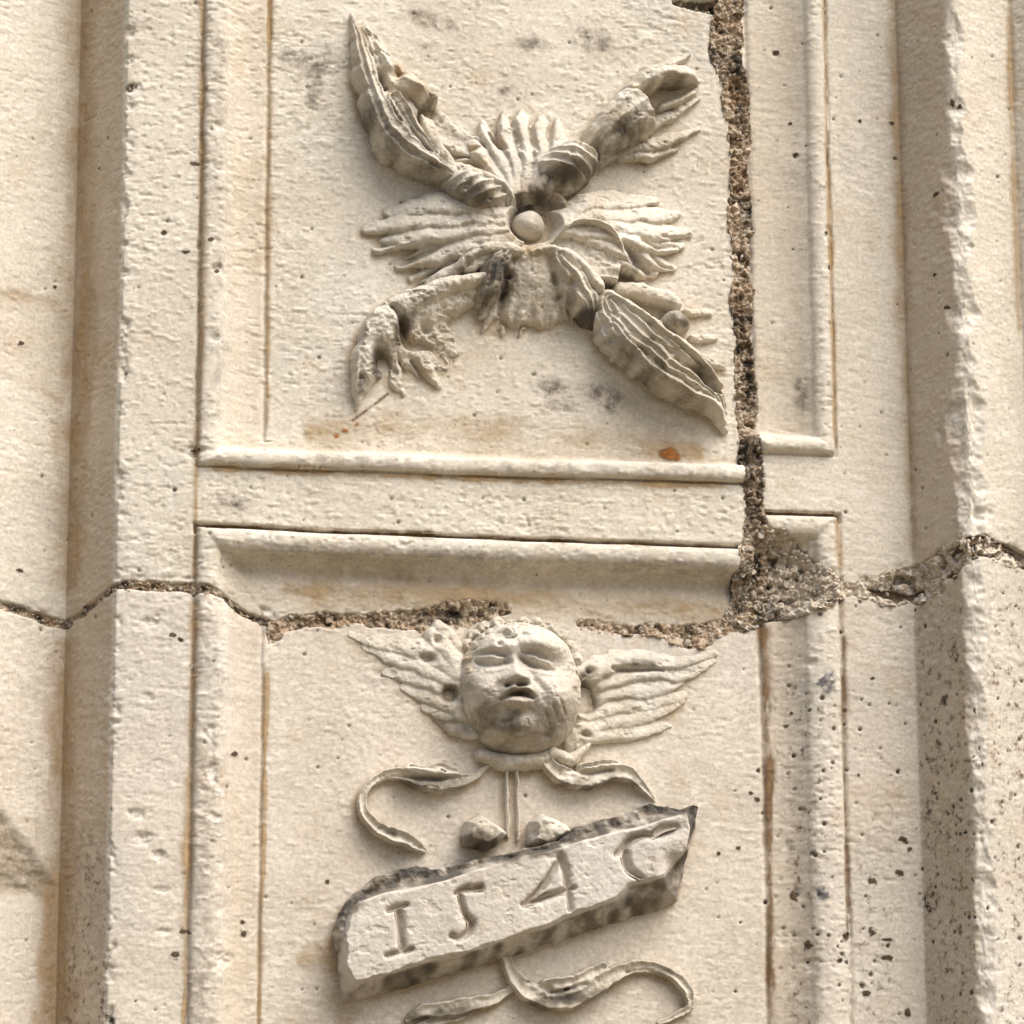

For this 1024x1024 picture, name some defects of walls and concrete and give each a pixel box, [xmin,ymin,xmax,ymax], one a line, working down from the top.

crack [672,0,770,630]
crack [352,393,388,421]
corrosion [660,447,681,461]
spalling [576,482,1024,650]
crack [0,580,273,630]